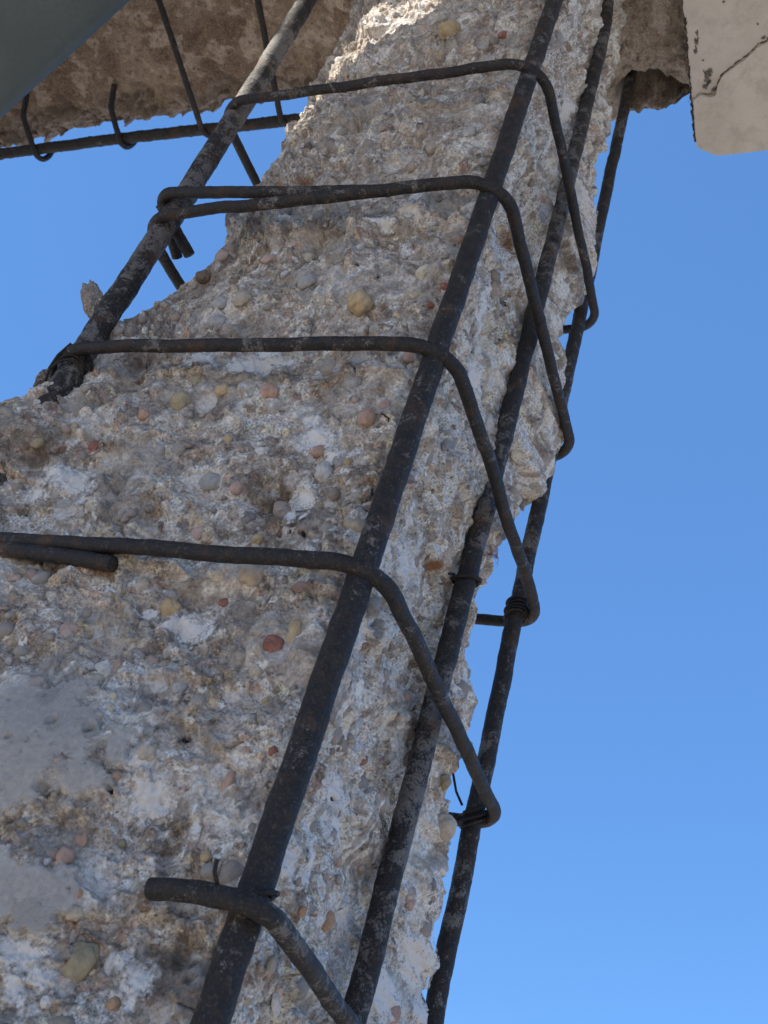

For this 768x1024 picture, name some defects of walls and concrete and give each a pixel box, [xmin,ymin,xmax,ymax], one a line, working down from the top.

crack [684,18,768,142]
rust [425,555,445,573]